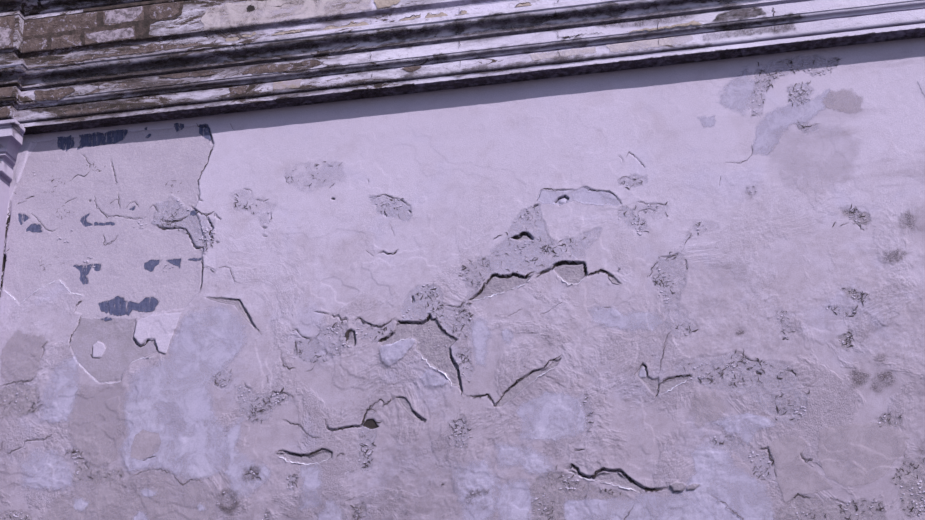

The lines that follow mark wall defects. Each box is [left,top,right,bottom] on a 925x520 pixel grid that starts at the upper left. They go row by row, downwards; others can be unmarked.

flaking render [0,0,184,54]
peeling [201,0,400,42]
damp [216,0,805,59]
spalling [607,20,702,52]
damp [42,66,112,86]
damp [123,53,206,74]
spalling [242,59,325,90]
spalling [530,47,596,60]
peeling [750,55,840,116]
damp [31,97,138,113]
peeling [0,123,292,495]
crack [314,311,392,327]